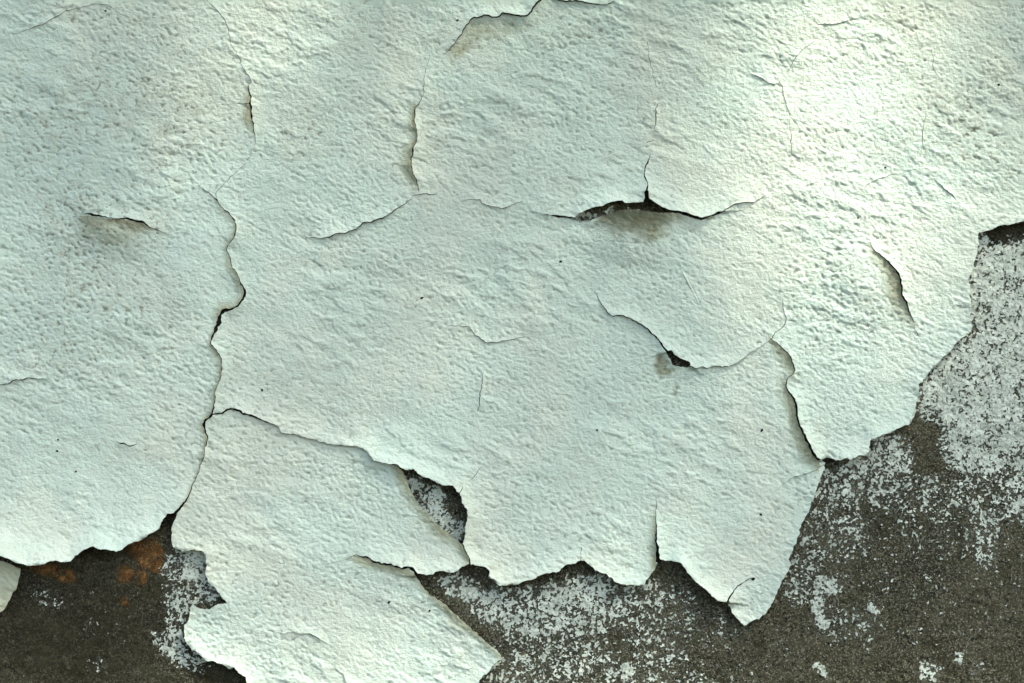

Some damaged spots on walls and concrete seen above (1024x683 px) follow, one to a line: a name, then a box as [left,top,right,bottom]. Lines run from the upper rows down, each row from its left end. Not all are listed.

crack [304,0,541,239]
crack [550,42,766,223]
peeling [0,366,50,384]
corrosion [31,564,74,581]
spalling [0,462,266,683]
corrosion [119,540,163,584]
crack [179,0,405,510]
crack [326,555,420,577]
spalling [207,204,1024,683]
crack [654,501,662,562]
crack [596,294,829,490]
crack [871,245,918,335]